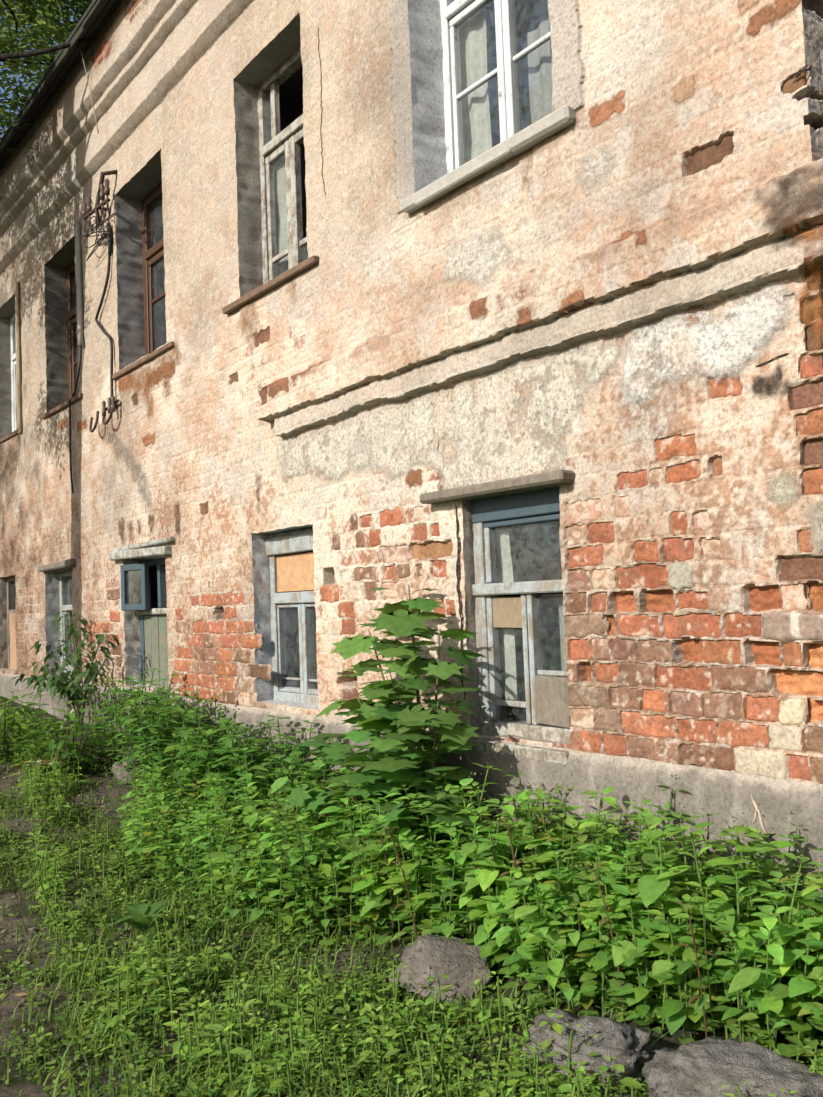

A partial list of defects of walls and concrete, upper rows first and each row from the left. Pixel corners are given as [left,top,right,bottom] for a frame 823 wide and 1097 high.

spalling [738,0,823,36]
crack [318,28,326,196]
spalling [687,134,734,175]
water stain [764,168,823,241]
spalling [782,72,807,94]
flaking render [767,262,823,505]
flaking render [173,593,272,707]
flaking render [328,676,359,702]
flaking render [320,507,456,635]
crack [455,505,465,699]
flaking render [565,435,823,784]